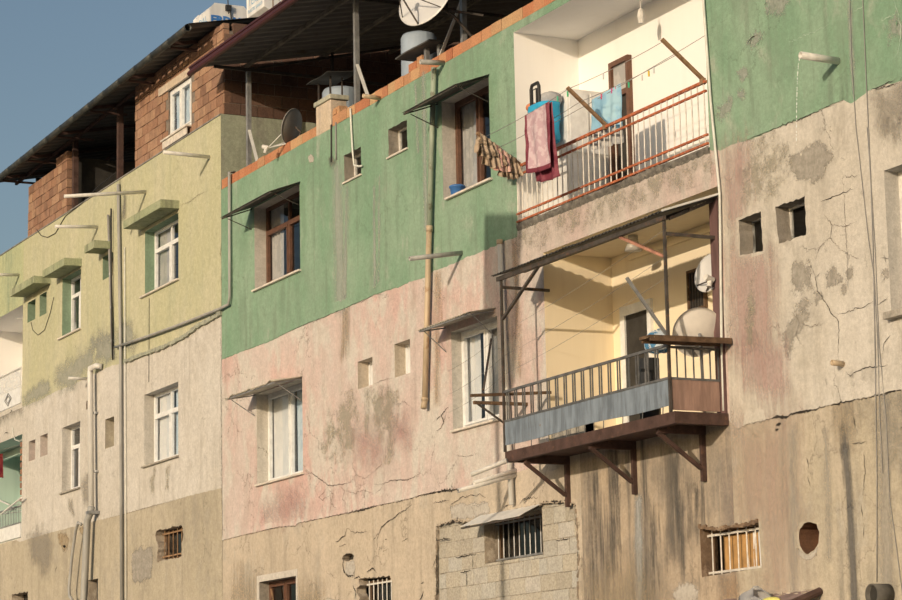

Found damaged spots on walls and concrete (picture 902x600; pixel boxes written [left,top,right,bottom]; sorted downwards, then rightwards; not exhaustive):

peeling [789,141,833,184]
peeling [782,259,853,357]
crack [738,173,902,444]
crack [222,449,538,596]
water stain [598,496,646,600]